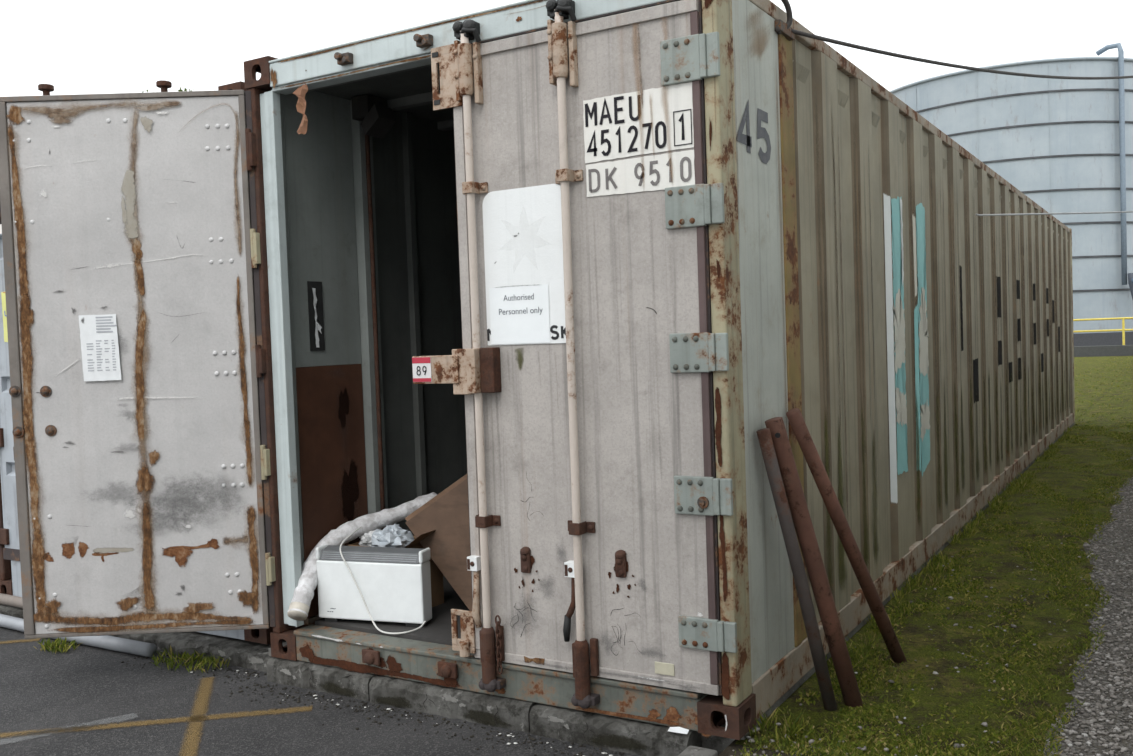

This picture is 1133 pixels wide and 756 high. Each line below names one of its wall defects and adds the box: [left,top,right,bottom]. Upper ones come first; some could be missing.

rust [270,0,545,88]
peeling [121,170,138,238]
rust [6,101,259,633]
rust [714,387,722,467]
rust [719,515,727,602]
rust [299,644,460,688]
rust [721,652,730,700]
rust [579,707,711,737]